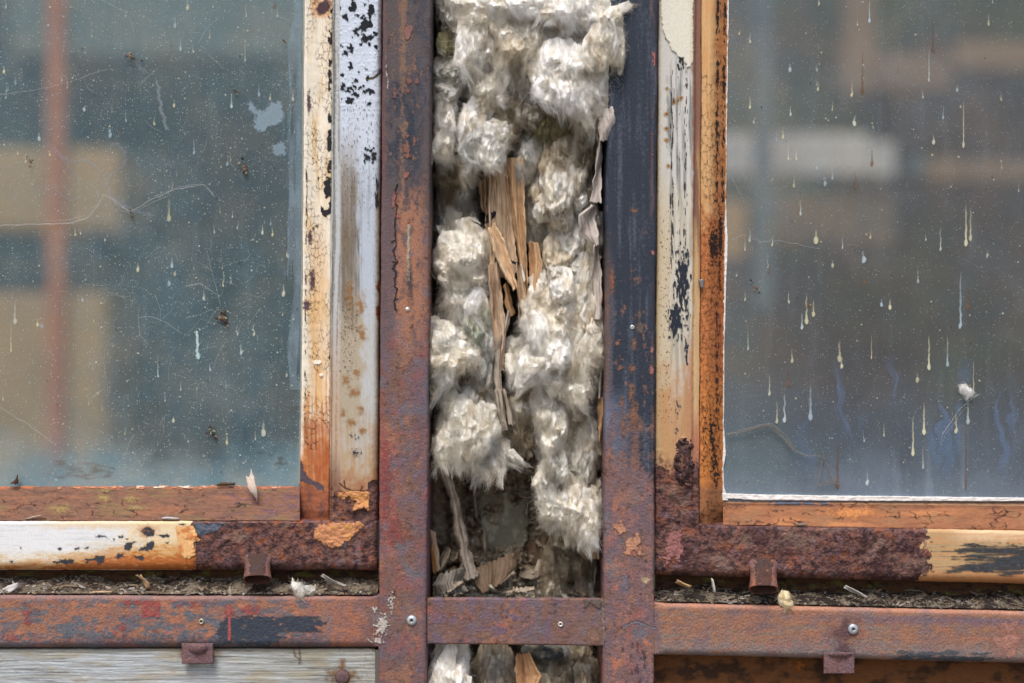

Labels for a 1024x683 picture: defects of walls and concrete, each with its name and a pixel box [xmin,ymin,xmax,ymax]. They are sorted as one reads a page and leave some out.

peeling [328,0,419,111]
peeling [363,147,379,208]
peeling [661,0,694,365]
crack [304,0,398,450]
crack [699,75,949,529]
corrosion [618,365,640,434]
peeling [53,522,226,565]
corrosion [0,523,331,570]
corrosion [612,465,932,581]
peeling [947,543,1024,576]
spalling [468,644,480,676]
corrosion [834,619,850,652]